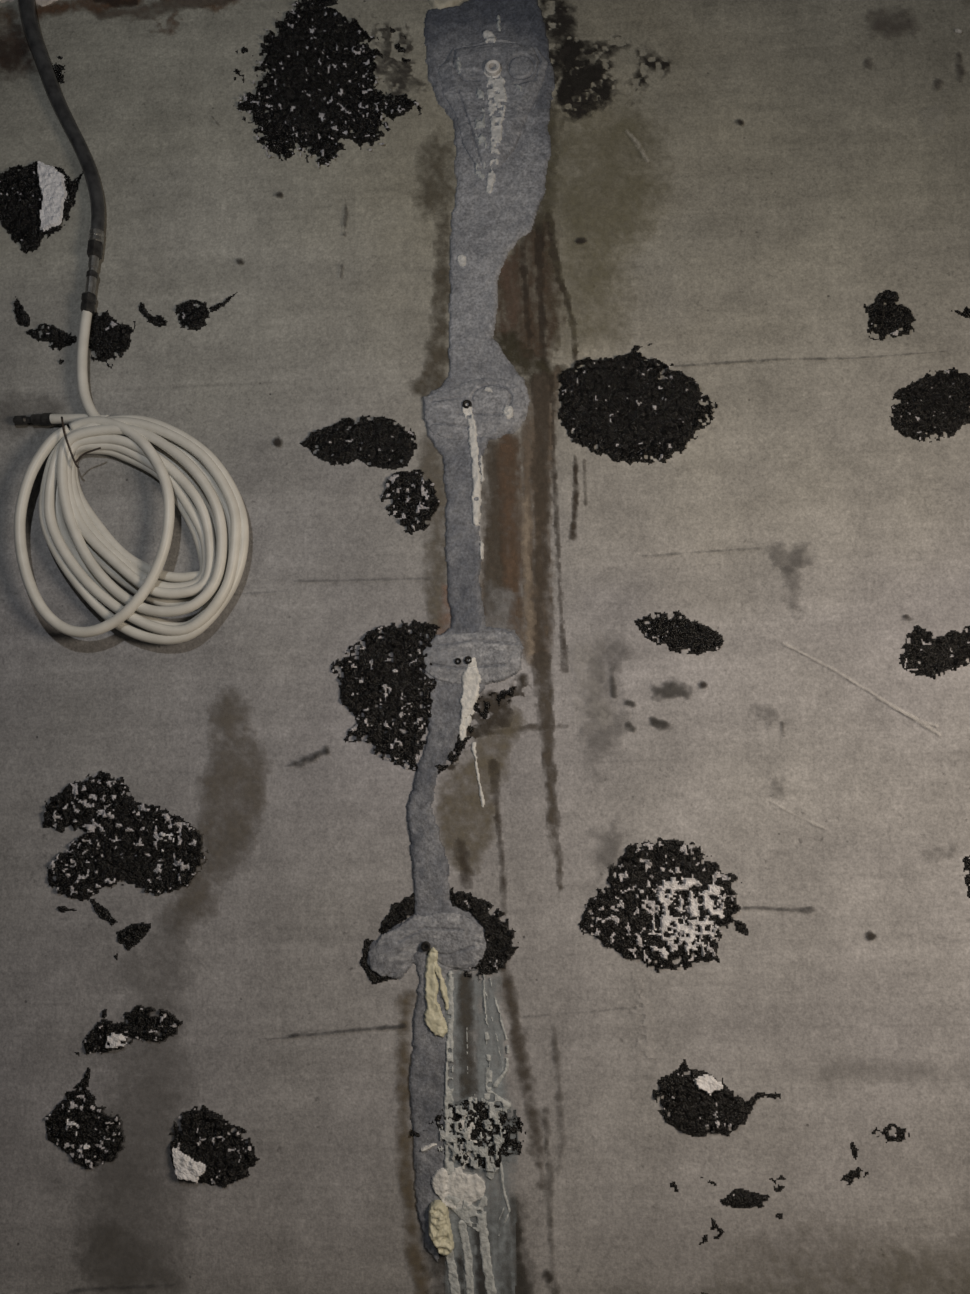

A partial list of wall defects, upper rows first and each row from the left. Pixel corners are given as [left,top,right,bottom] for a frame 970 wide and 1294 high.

corrosion [482,210,579,665]